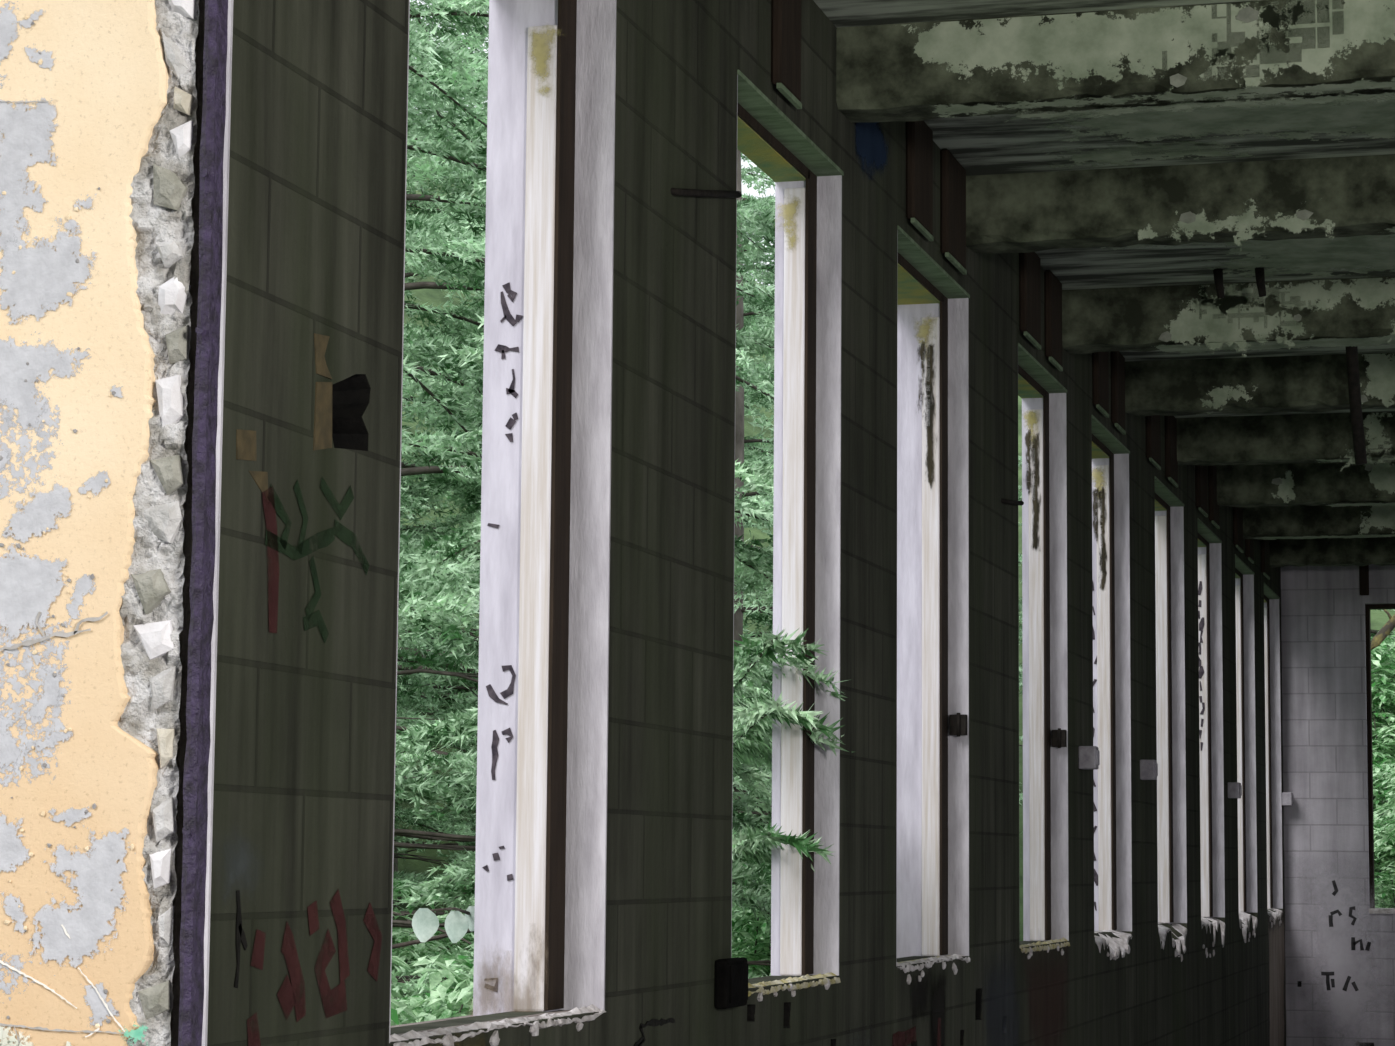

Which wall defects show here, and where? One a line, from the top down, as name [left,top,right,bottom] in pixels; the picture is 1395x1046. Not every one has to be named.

peeling [891,0,1395,168]
spalling [0,0,199,1046]
spalling [313,333,370,451]
peeling [1101,197,1395,540]